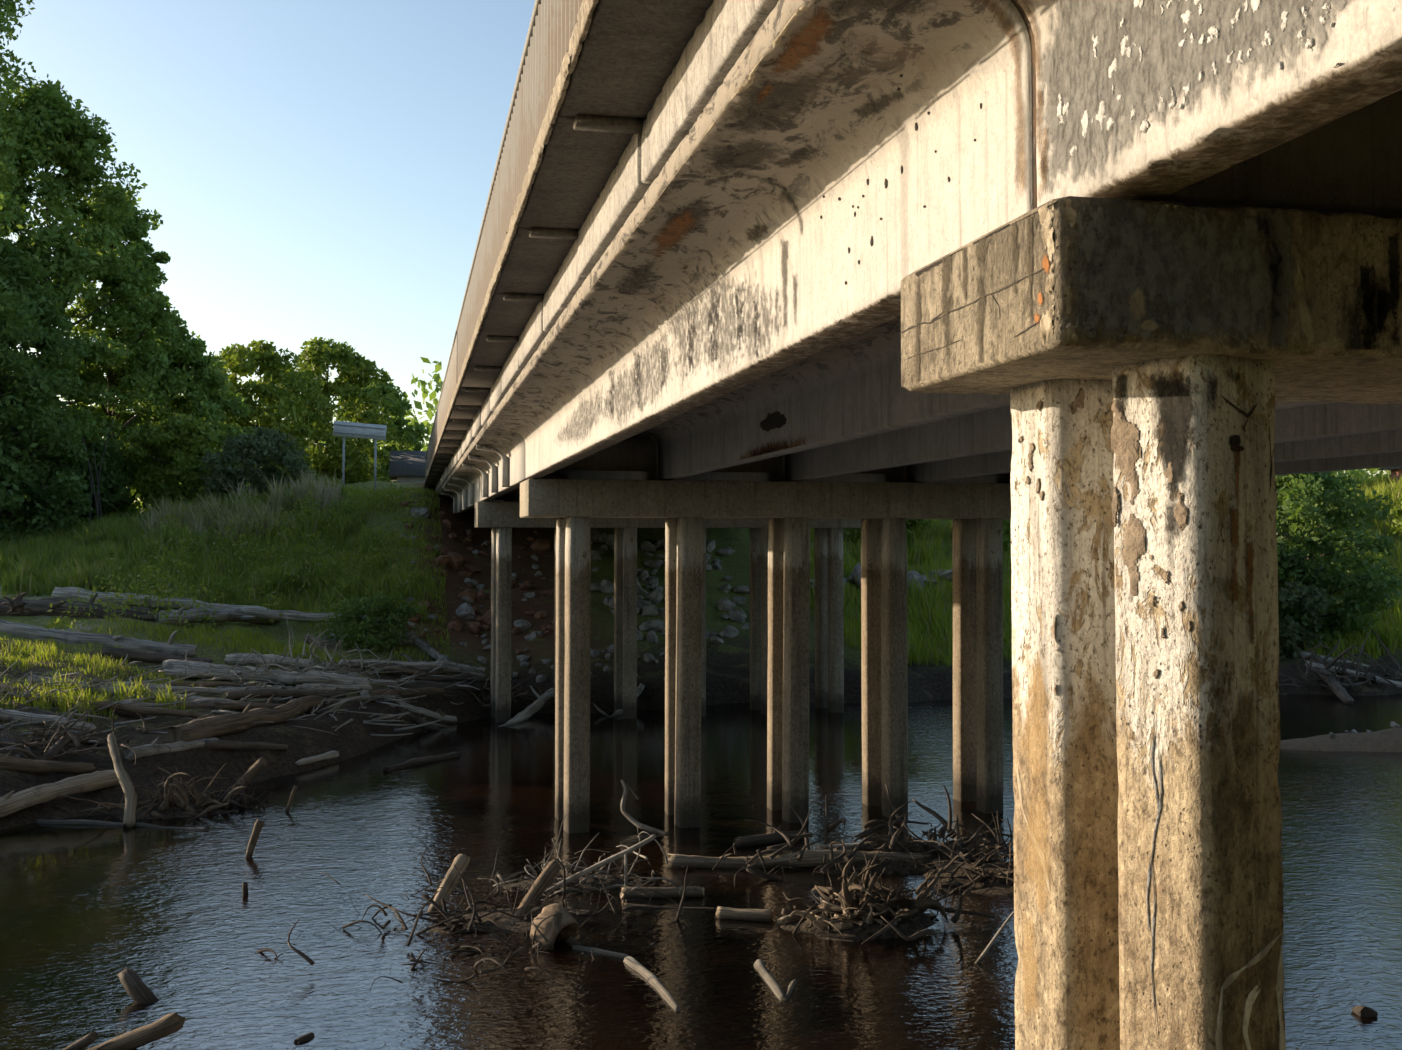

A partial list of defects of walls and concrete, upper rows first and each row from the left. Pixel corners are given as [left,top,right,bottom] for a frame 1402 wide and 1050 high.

corrosion [756,7,833,105]
water stain [854,92,903,118]
water stain [1034,0,1348,193]
water stain [554,41,870,447]
water stain [1074,201,1402,350]
water stain [1115,375,1127,422]
water stain [1150,369,1240,551]
crack [1146,726,1163,1036]